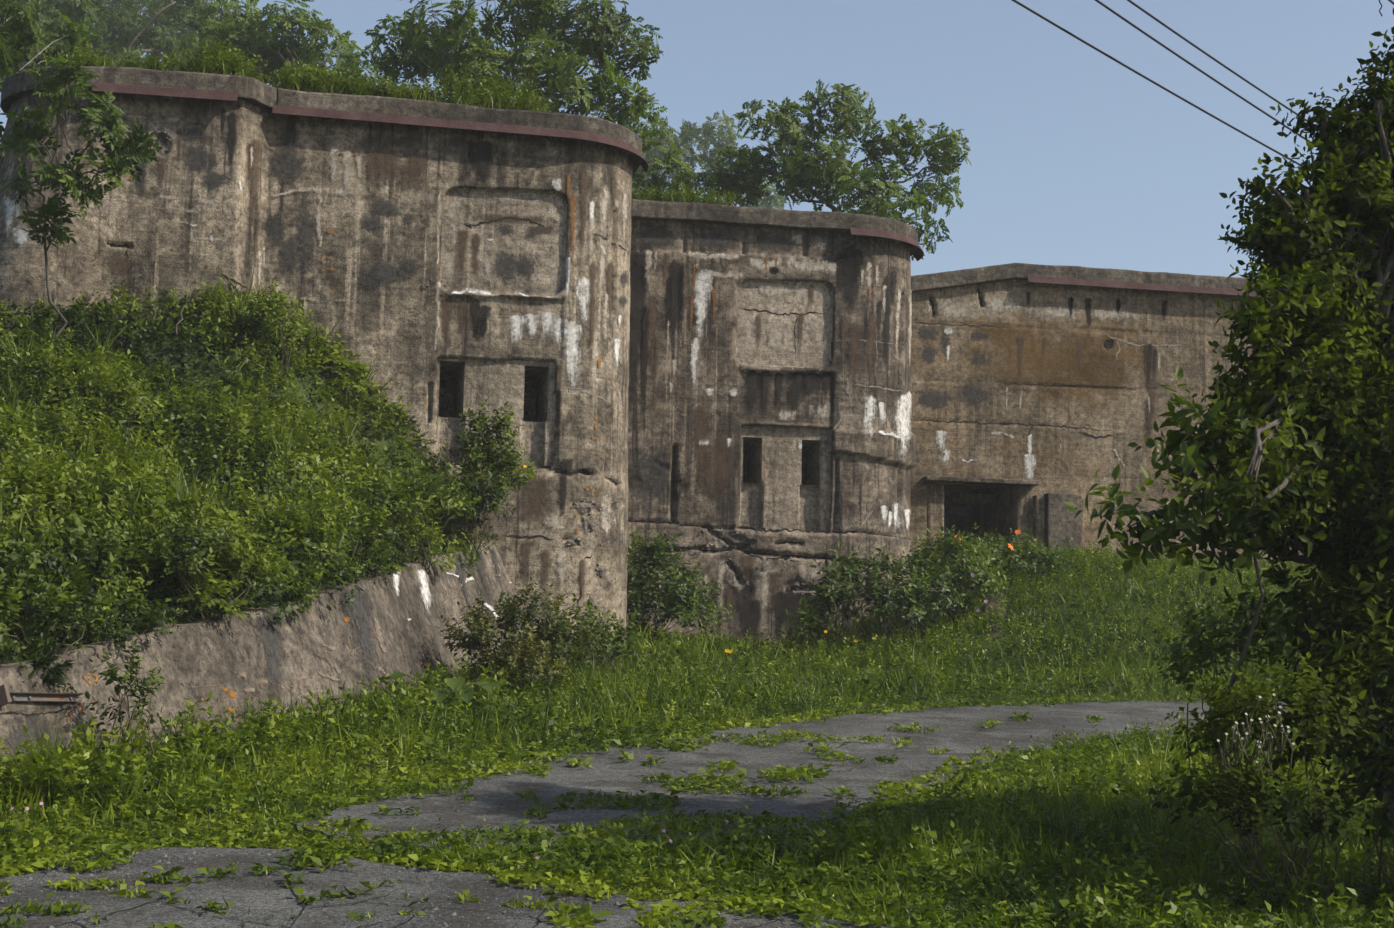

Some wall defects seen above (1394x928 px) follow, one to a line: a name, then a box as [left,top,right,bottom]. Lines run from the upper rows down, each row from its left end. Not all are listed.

damp [363,198,415,231]
damp [580,171,594,246]
damp [442,215,557,340]
damp [510,225,896,495]
damp [918,327,953,364]
damp [864,384,988,448]
crack [436,460,908,580]
damp [881,503,910,529]
damp [418,570,431,608]
damp [447,541,550,617]
crack [577,556,592,606]